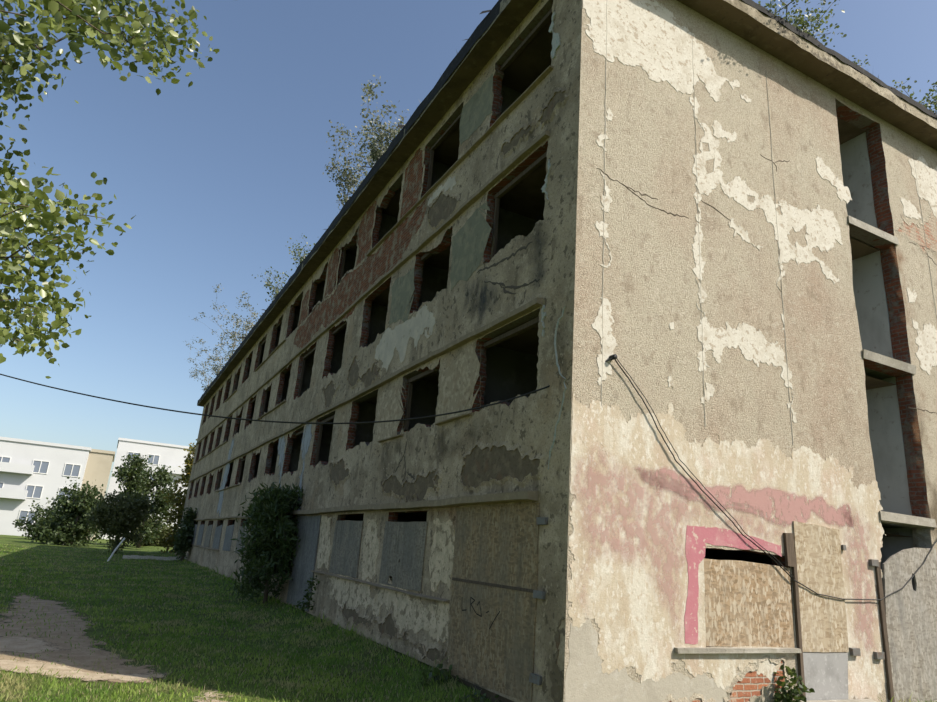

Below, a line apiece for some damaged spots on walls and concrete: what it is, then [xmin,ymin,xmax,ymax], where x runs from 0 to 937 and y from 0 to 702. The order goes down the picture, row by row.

flaking render [293,145,460,350]
crack [597,168,731,221]
flaking render [583,0,843,423]
flaking render [815,156,852,204]
flaking render [894,156,937,258]
peeling [322,268,436,409]
flaking render [912,319,937,375]
peeling [376,382,406,446]
flaking render [460,440,545,494]
peeling [317,515,450,668]
peeling [429,518,455,592]
peeling [549,393,887,702]